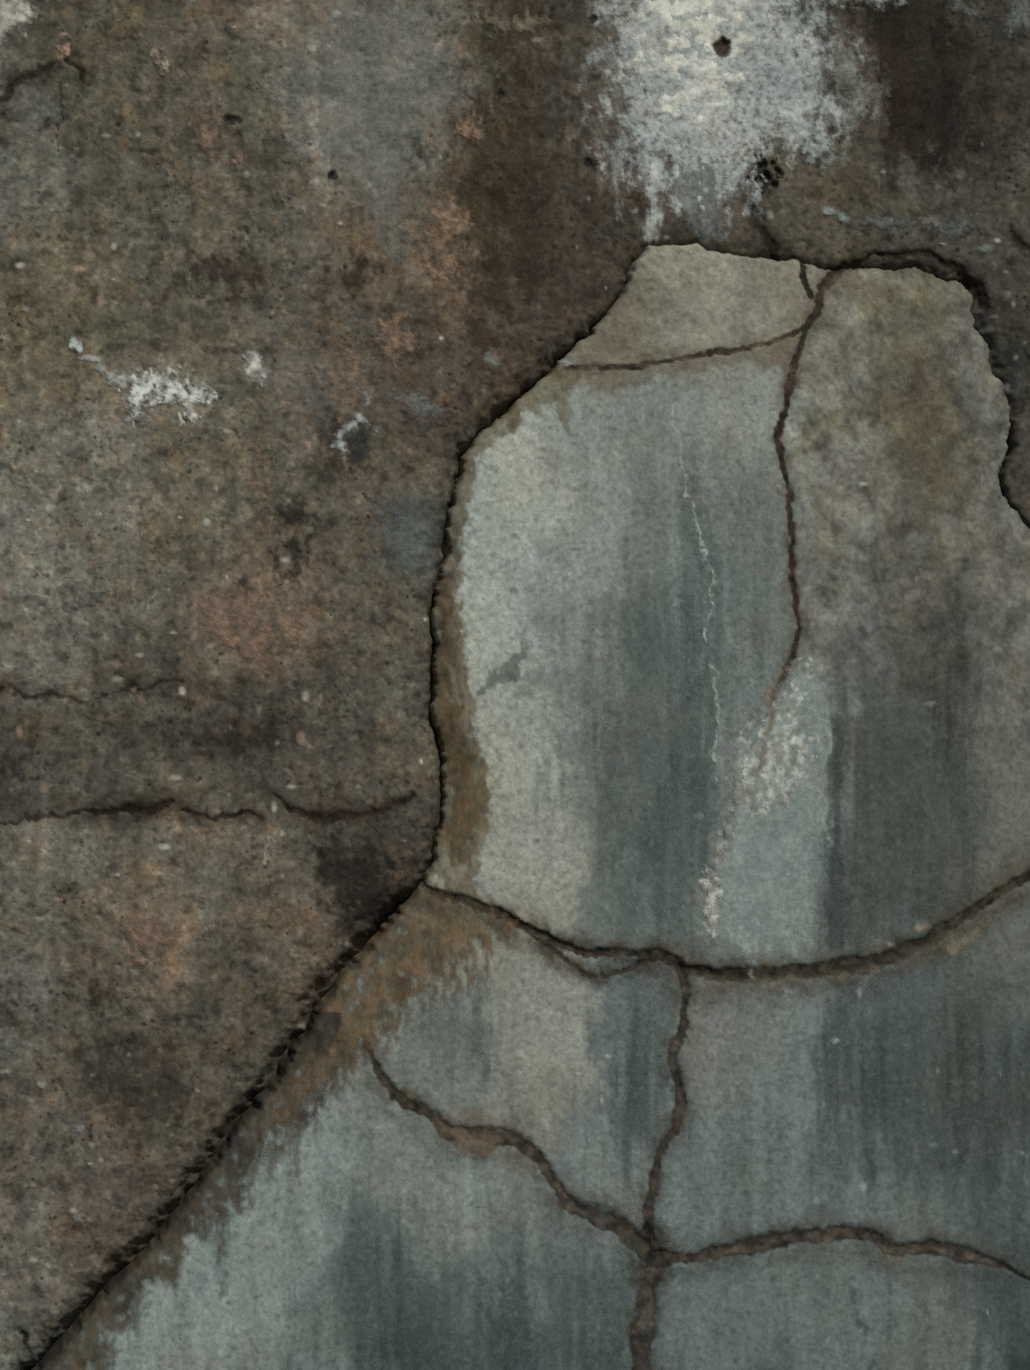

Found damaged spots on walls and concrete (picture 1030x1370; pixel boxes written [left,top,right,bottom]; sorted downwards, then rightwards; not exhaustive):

spalling [454,105,484,139]
damp [586,0,983,247]
spalling [421,194,470,281]
crack [1010,223,1030,250]
spalling [370,312,416,362]
crack [561,204,990,918]
spalling [198,591,305,665]
crack [0,791,417,825]
damp [699,658,932,958]
spalling [116,917,182,965]
crack [368,870,1030,1370]